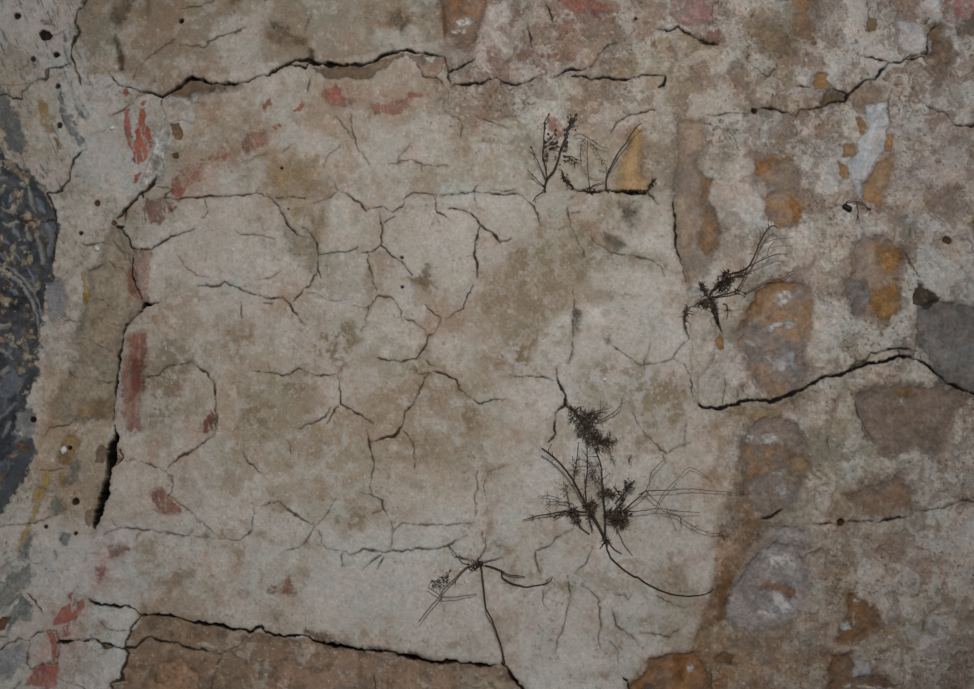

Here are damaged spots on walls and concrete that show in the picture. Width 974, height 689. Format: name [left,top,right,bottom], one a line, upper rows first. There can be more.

crack [112,49,535,113]
crack [558,68,666,132]
crack [567,178,686,277]
spalling [843,234,906,321]
crack [89,176,539,536]
crack [515,321,574,442]
spalling [735,280,813,400]
crack [690,347,974,411]
spalling [850,282,974,456]
spalling [715,415,813,630]
spalling [629,651,712,689]
spalling [825,593,895,689]